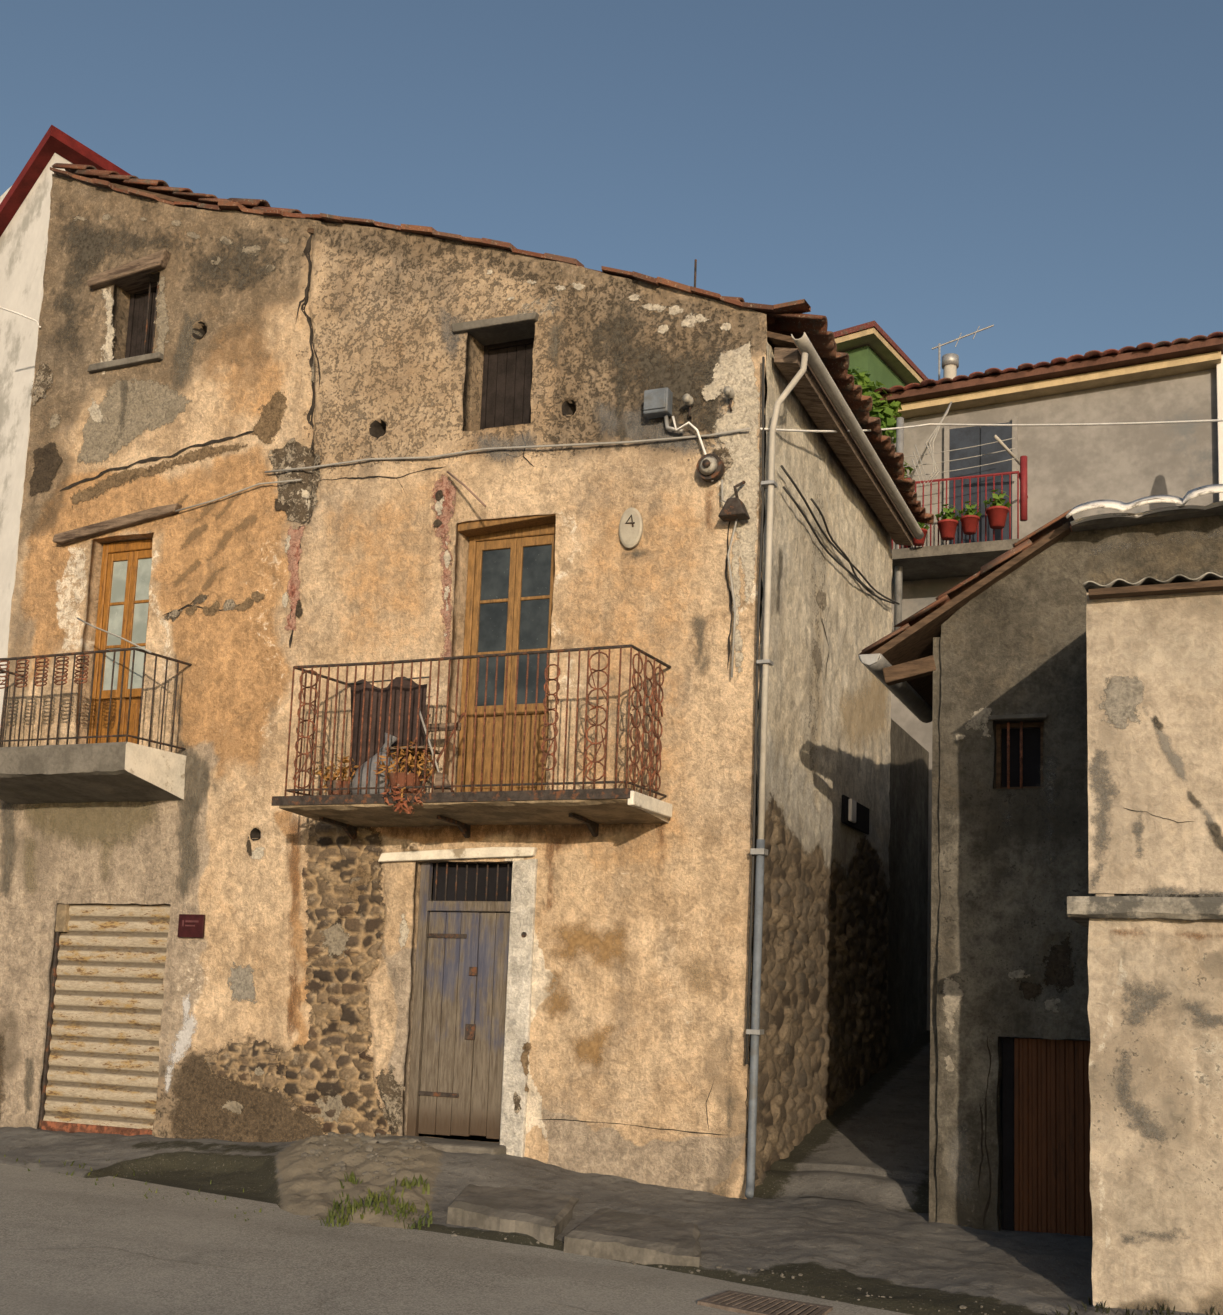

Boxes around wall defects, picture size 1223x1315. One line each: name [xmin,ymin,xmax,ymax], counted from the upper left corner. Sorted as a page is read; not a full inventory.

peeling [627,294,732,334]
crack [295,234,446,566]
peeling [29,276,321,631]
peeling [702,341,761,673]
crack [162,595,253,616]
spalling [431,474,457,657]
spalling [169,820,409,1143]
damp [552,925,624,964]
damp [575,1027,609,1063]
damp [1123,983,1166,1026]
damp [1185,999,1223,1028]
damp [1117,1055,1167,1147]